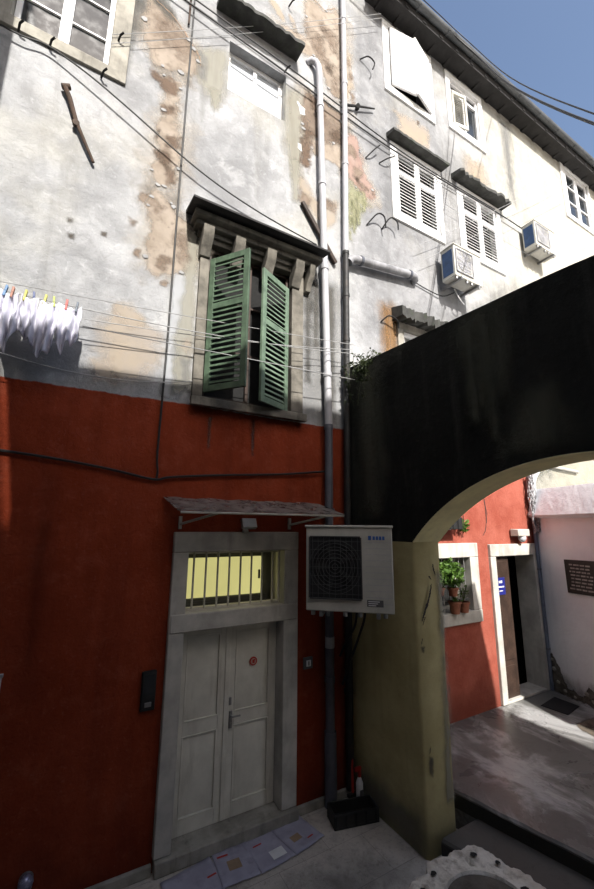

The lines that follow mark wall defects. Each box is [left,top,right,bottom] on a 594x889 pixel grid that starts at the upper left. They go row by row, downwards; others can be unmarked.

flaking render [134,0,201,286]
flaking render [299,177,337,226]
flaking render [282,0,376,199]
spalling [551,653,594,708]